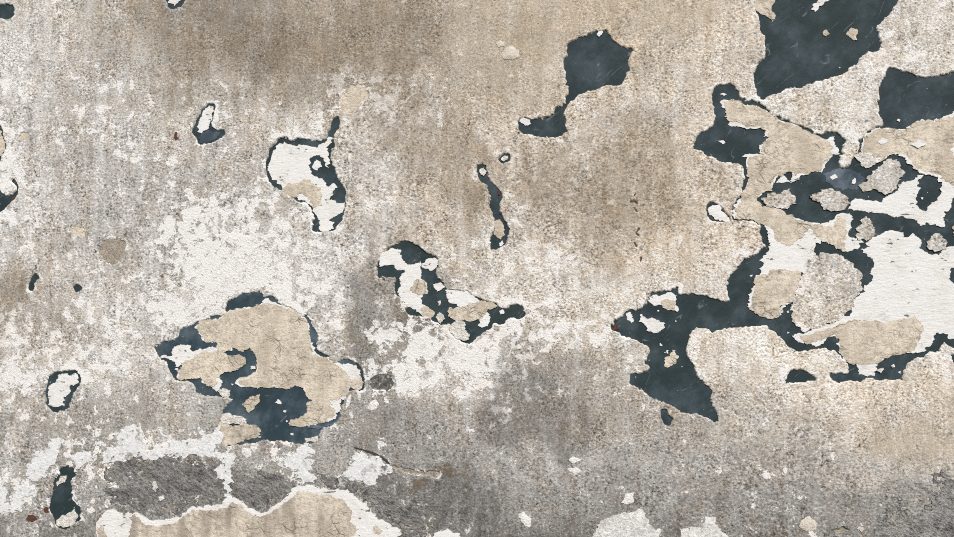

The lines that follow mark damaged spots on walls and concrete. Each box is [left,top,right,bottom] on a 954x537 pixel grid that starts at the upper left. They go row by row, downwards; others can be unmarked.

peeling [0,4,15,19]
peeling [0,179,19,212]
peeling [192,104,225,145]
peeling [266,84,370,232]
peeling [476,164,510,250]
peeling [518,30,633,138]
peeling [611,0,954,426]
peeling [377,241,526,344]
peeling [45,370,81,413]
peeling [154,291,394,458]
peeling [49,454,460,537]
peeling [592,493,661,537]